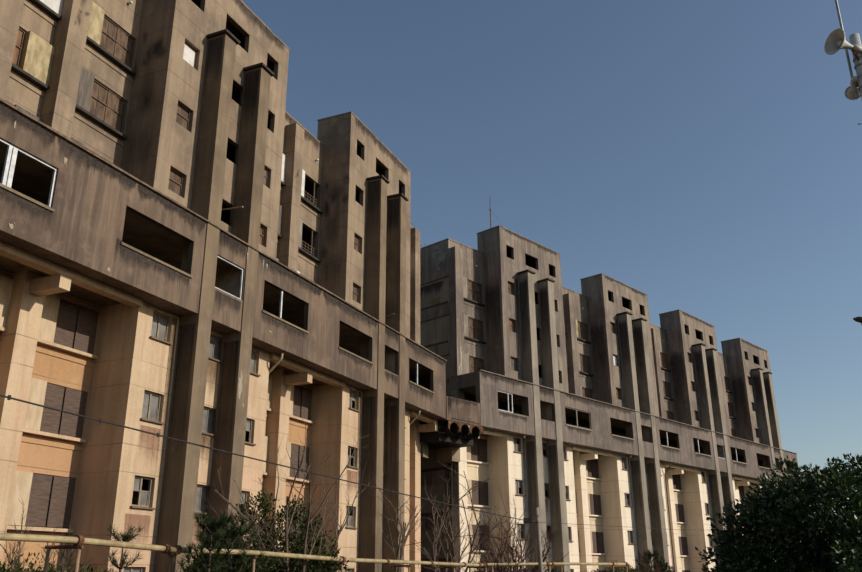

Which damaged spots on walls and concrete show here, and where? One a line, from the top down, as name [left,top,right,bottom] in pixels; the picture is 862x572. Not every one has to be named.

leakage [0,104,205,230]
leakage [368,180,399,223]
leakage [219,231,248,259]
leakage [216,290,241,310]
leakage [259,254,445,364]
leakage [591,327,606,361]
leakage [616,319,644,368]
leakage [669,350,716,394]
leakage [732,374,772,411]